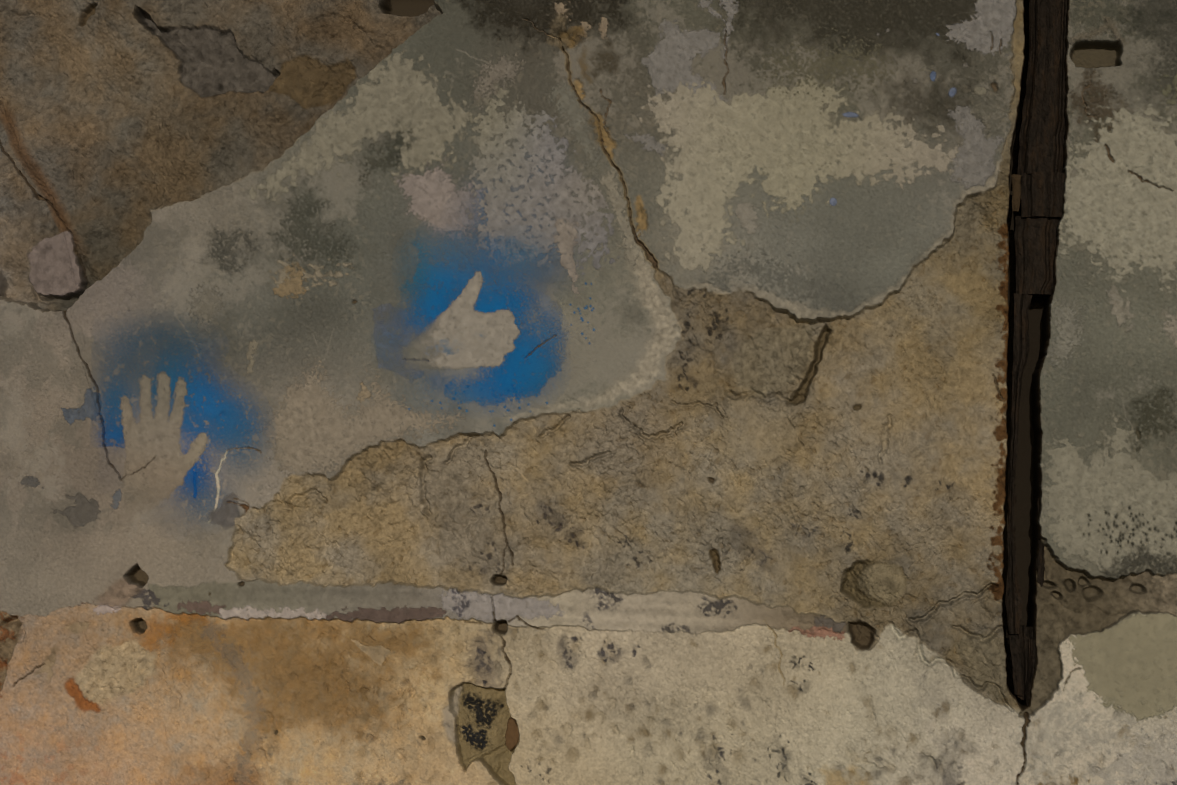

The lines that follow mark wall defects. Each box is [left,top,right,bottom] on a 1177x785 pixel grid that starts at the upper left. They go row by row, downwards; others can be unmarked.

crack [0,140,90,287]
spalling [0,0,614,312]
crack [523,18,659,269]
peeling [61,387,101,425]
crack [63,310,155,479]
spalling [177,0,1177,721]
spalling [0,611,22,693]
peeling [54,489,122,528]
peeling [69,579,139,615]
crack [465,451,545,691]
spalling [450,683,520,785]
crack [1017,712,1031,785]